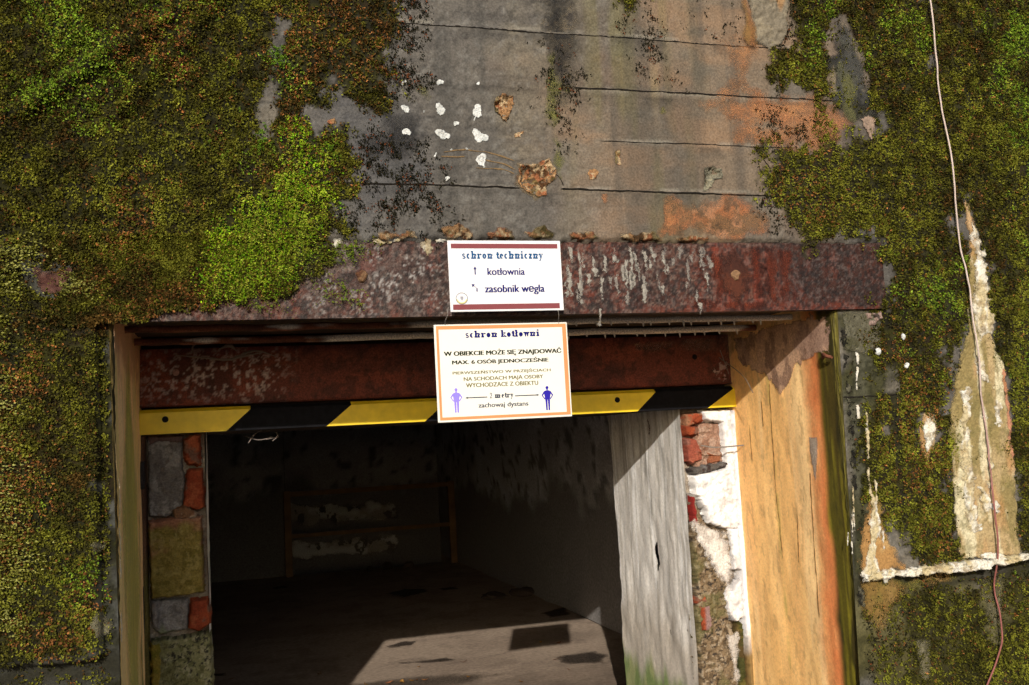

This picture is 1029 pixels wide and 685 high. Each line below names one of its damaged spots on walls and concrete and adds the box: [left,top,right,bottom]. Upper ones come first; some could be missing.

spalling [494,93,514,121]
spalling [516,158,557,200]
corrosion [661,196,768,301]
peeling [734,310,883,394]
peeling [809,437,818,480]
spalling [850,451,858,490]
spalling [680,415,744,685]